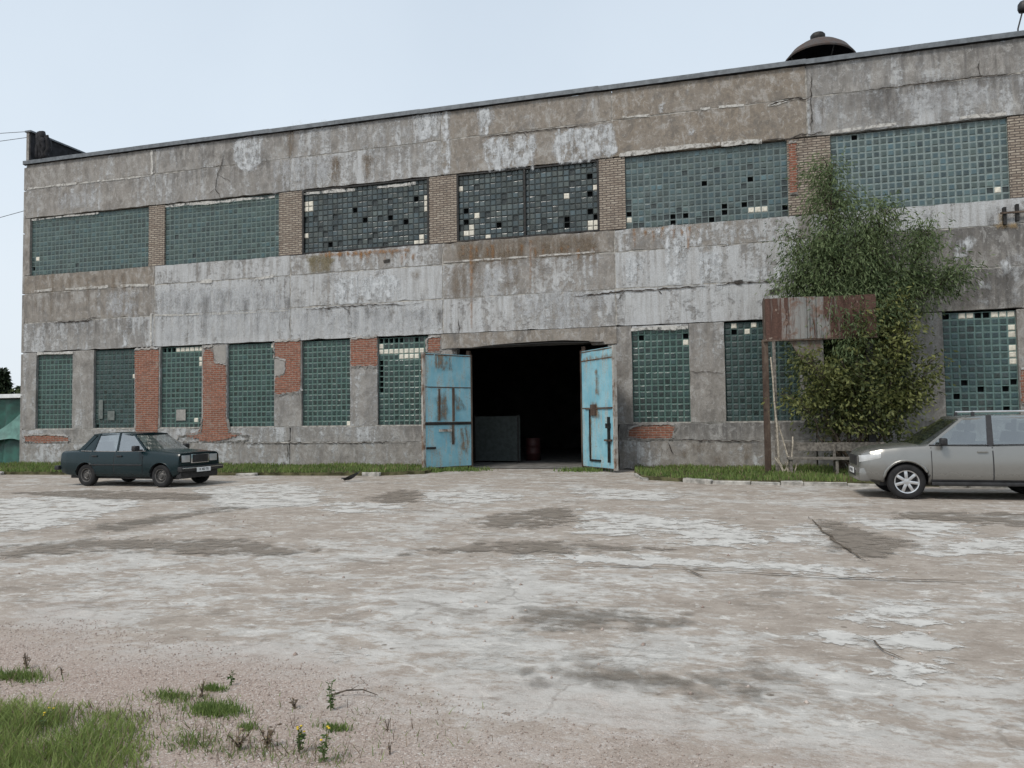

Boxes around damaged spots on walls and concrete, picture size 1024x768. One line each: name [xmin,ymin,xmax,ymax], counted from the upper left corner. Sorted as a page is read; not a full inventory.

damp [234,137,262,172]
damp [479,109,536,170]
damp [553,124,617,164]
flaking render [272,338,303,397]
flaking render [176,344,250,444]
corrosion [437,396,459,420]
flaking render [21,432,71,444]
flaking render [626,421,678,442]